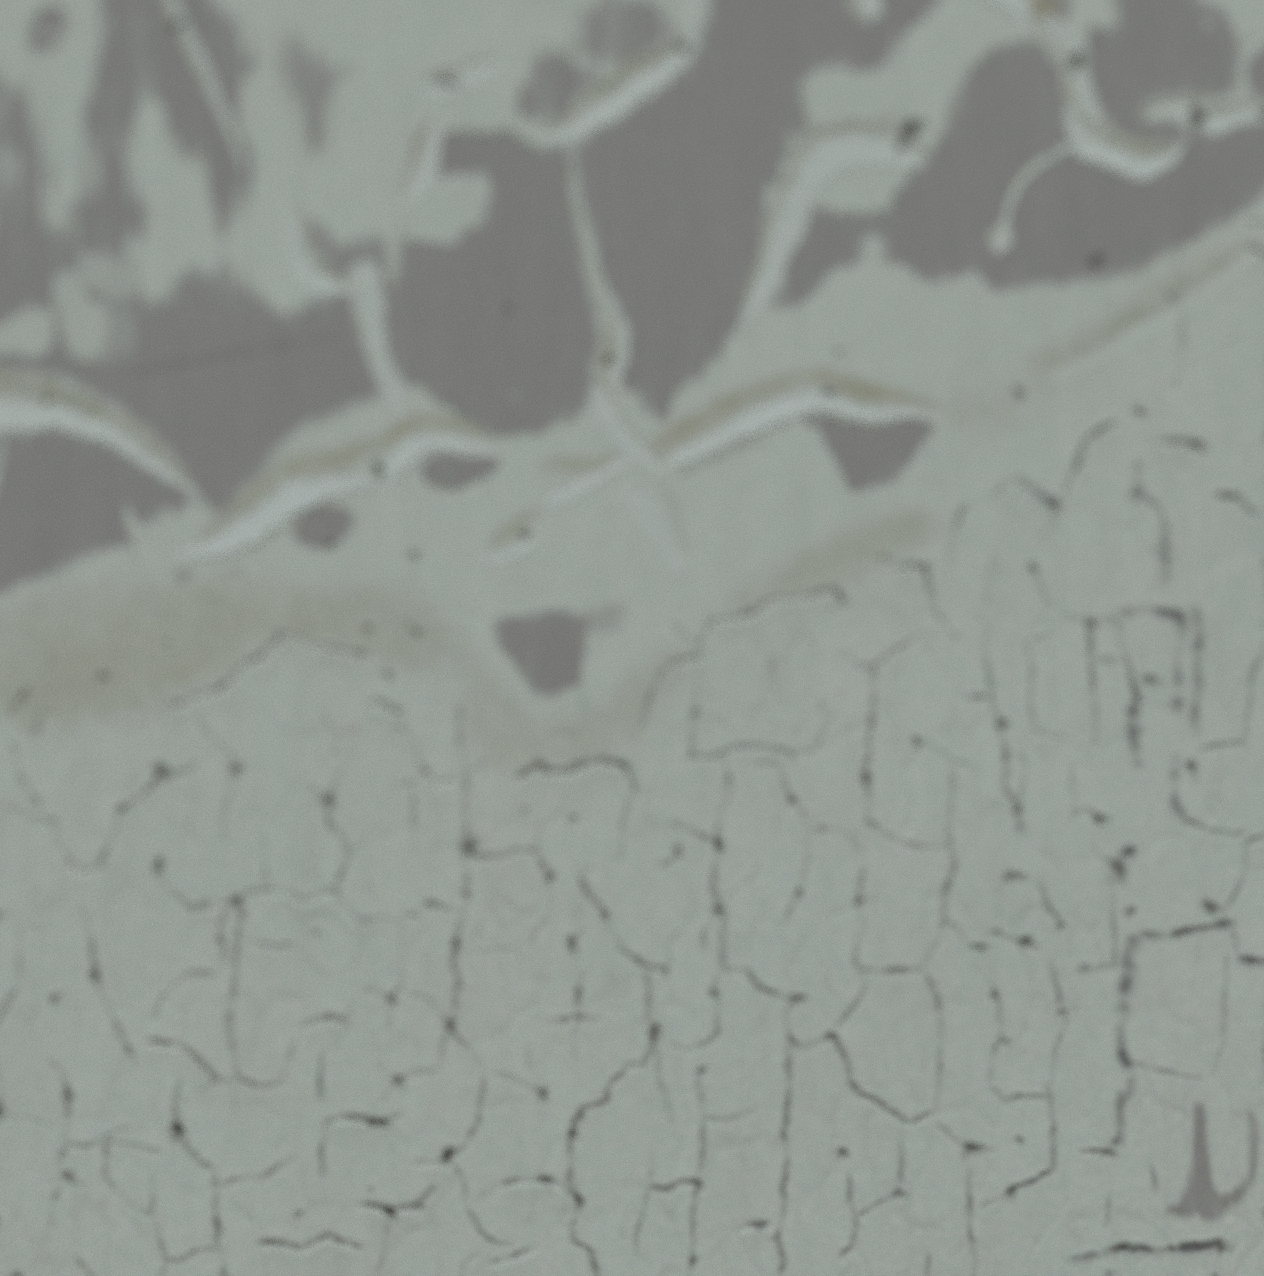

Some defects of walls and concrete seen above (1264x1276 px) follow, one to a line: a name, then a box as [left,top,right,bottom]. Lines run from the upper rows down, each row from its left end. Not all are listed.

peeling [0,0,1264,601]
peeling [489,597,637,703]
crack [0,399,1264,1276]